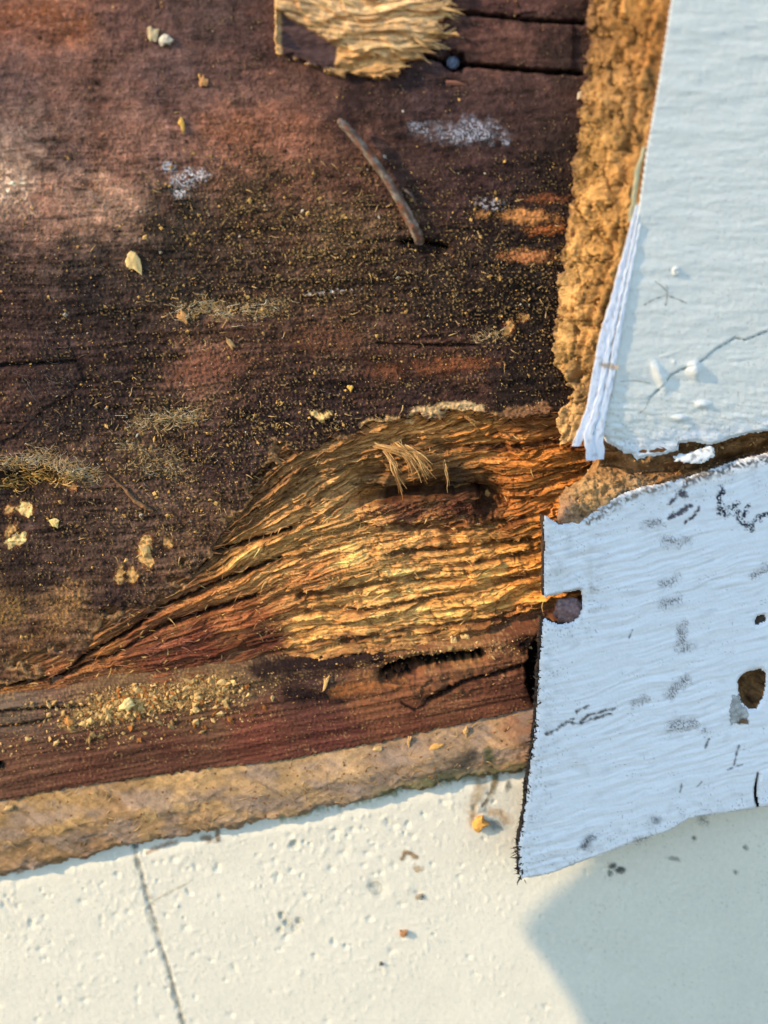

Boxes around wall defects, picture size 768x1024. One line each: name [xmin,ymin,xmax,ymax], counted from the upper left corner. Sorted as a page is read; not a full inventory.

water stain [0,151,31,207]
water stain [163,162,208,197]
water stain [476,193,564,235]
water stain [498,249,547,264]
peeling [360,401,484,426]
peeling [115,535,174,584]
water stain [251,652,386,678]
peeling [327,648,482,698]
crack [400,664,521,711]
spalling [729,694,748,725]
water stain [424,749,492,786]
water stain [481,774,498,807]